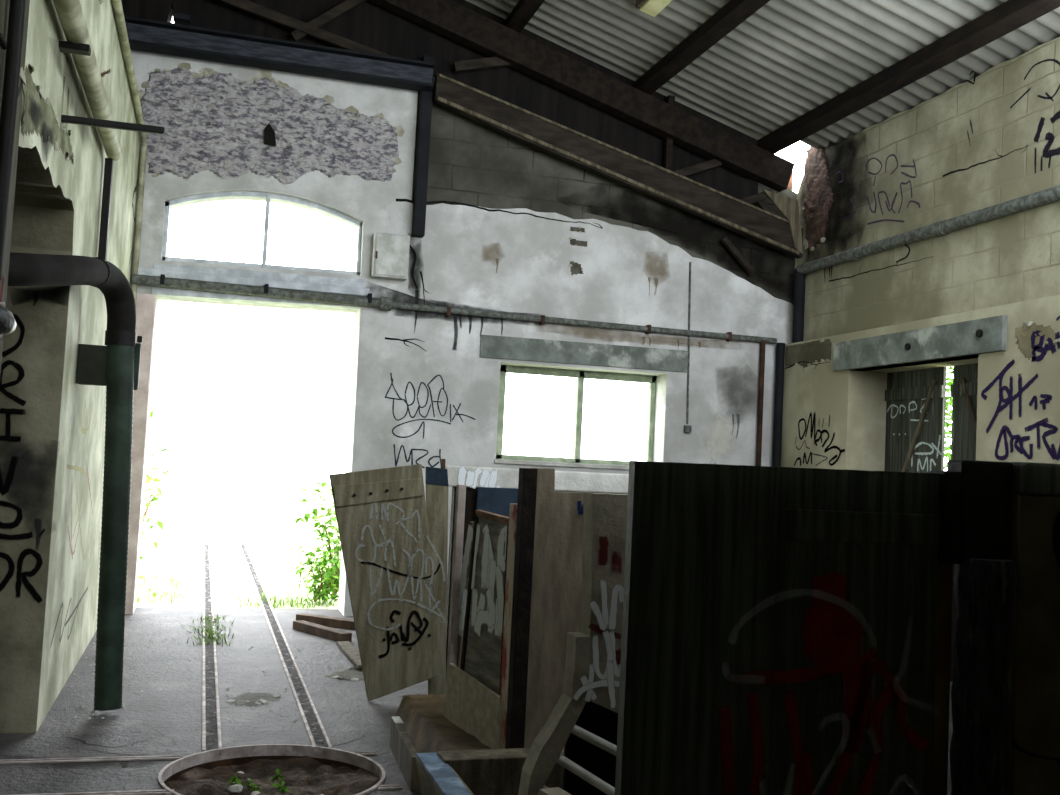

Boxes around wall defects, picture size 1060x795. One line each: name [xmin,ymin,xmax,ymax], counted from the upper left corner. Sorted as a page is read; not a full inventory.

peeling [20,64,74,164]
flaking render [138,62,405,185]
flaking render [803,146,833,252]
water stain [712,378,753,458]